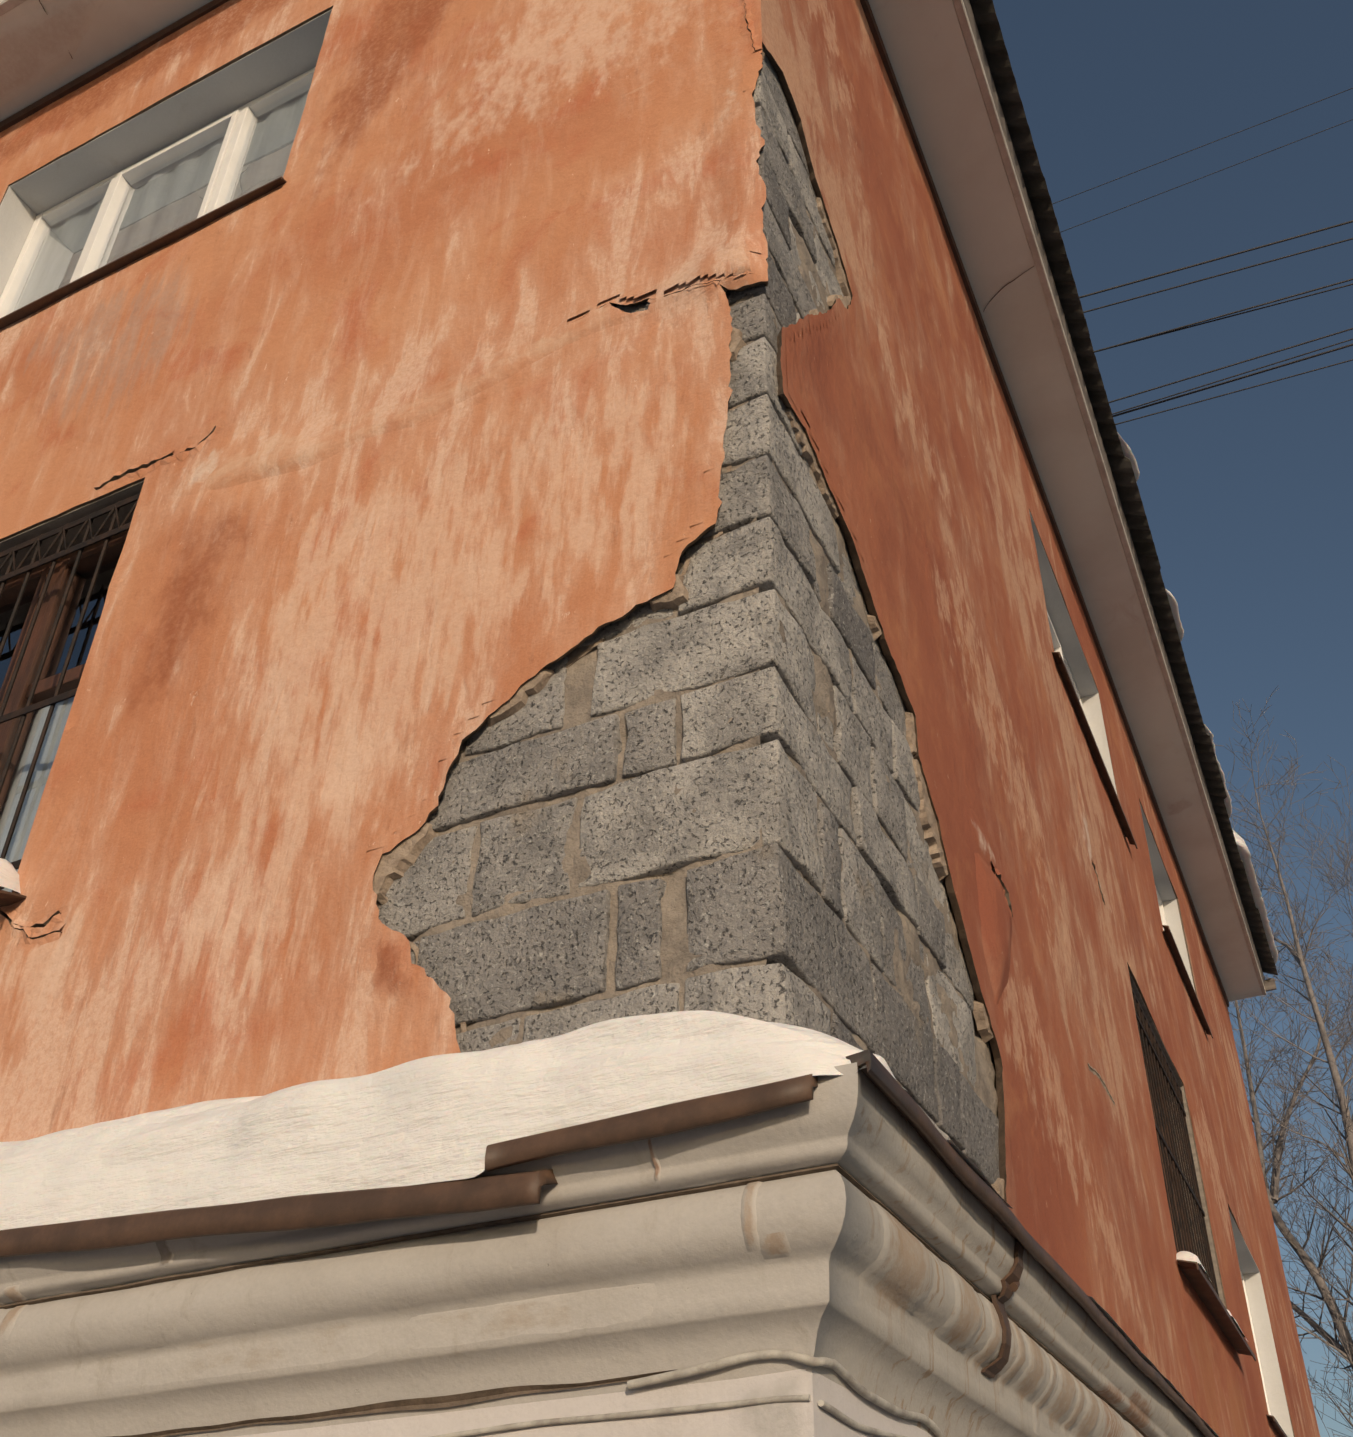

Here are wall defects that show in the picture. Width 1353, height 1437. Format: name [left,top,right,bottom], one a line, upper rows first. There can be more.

crack [647,278,721,303]
crack [94,426,223,498]
flaking render [0,0,1005,1199]
peeling [864,289,1080,1012]
crack [0,905,65,945]
crack [991,861,1013,920]
crack [1088,1063,1115,1105]
peeling [998,943,1157,1349]
peeling [136,1315,384,1386]
peeling [406,1283,657,1349]
crack [0,1163,1148,1437]
water stain [969,1293,1142,1437]